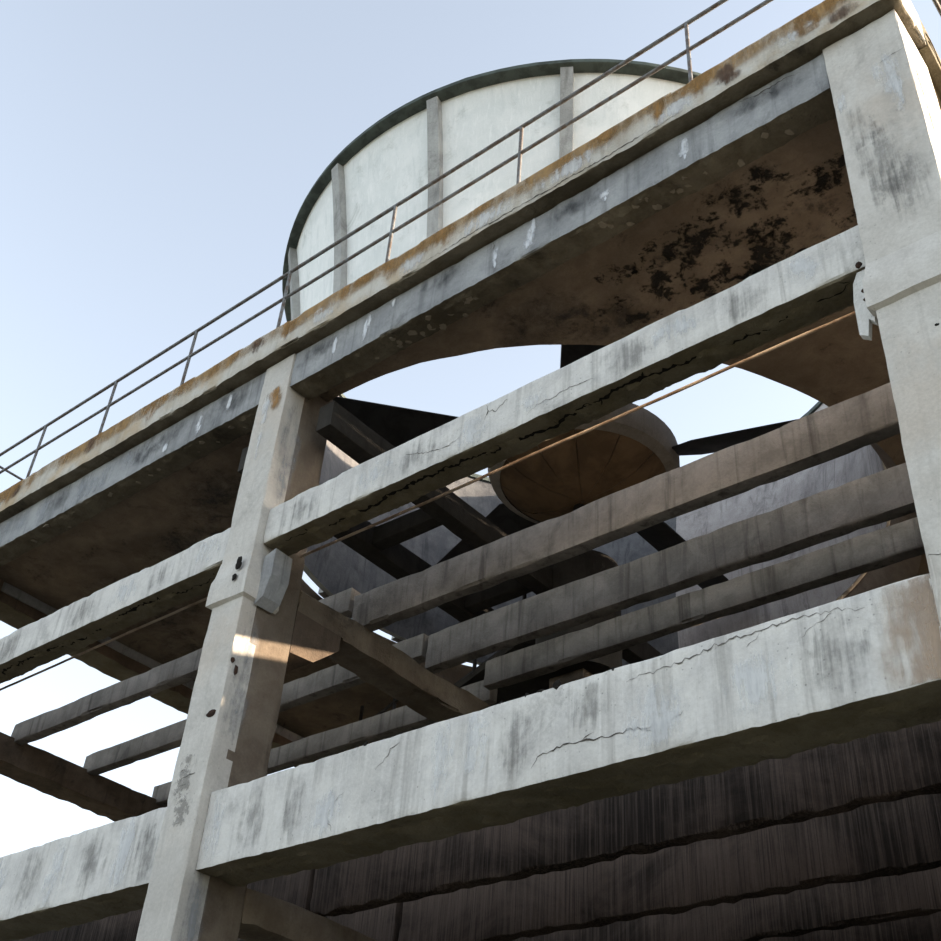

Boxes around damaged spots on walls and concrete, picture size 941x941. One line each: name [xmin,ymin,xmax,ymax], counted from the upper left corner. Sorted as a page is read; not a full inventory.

corrosion [272,42,759,337]
corrosion [62,339,262,462]
corrosion [271,387,281,408]
crack [285,356,696,541]
crack [533,726,651,765]